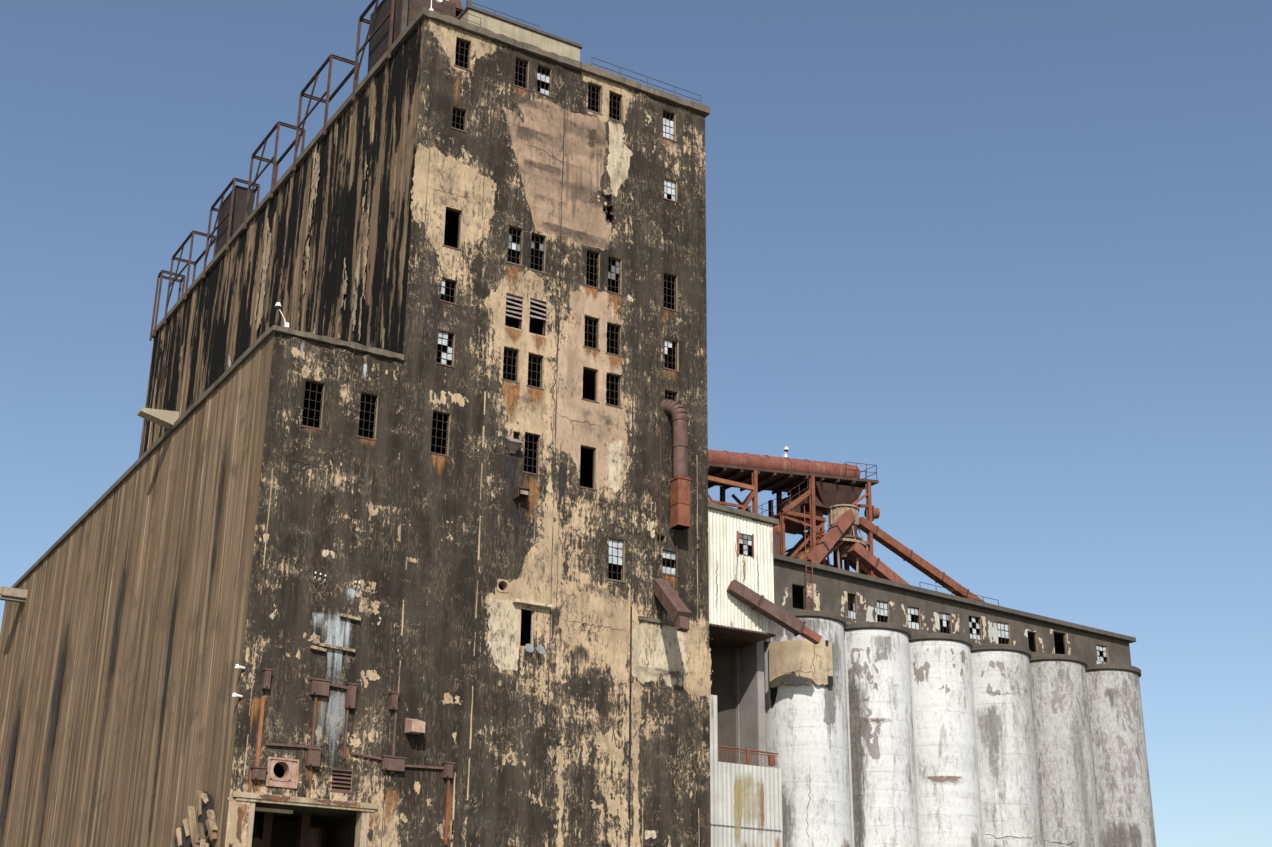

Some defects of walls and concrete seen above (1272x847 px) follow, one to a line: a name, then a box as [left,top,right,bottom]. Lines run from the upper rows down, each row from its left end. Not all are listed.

peeling [338,156,369,340]
peeling [410,143,497,275]
peeling [502,72,633,251]
spalling [175,790,244,847]
damp [571,646,587,671]
peeling [486,477,713,847]
rust [735,777,765,847]
peeling [823,638,888,760]
damp [875,637,891,652]
peeling [840,591,998,676]
damp [978,708,1002,762]
damp [1073,721,1141,847]